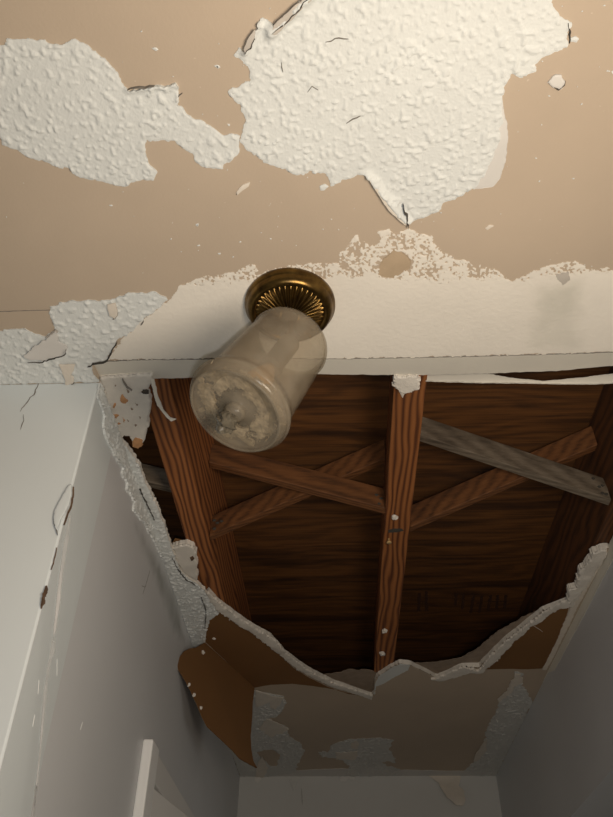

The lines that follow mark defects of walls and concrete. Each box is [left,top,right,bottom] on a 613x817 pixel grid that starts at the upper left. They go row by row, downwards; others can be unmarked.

peeling [0,0,579,228]
peeling [0,291,168,385]
spalling [542,566,601,670]
peeling [230,690,305,778]
peeling [318,737,404,777]
peeling [464,671,532,777]